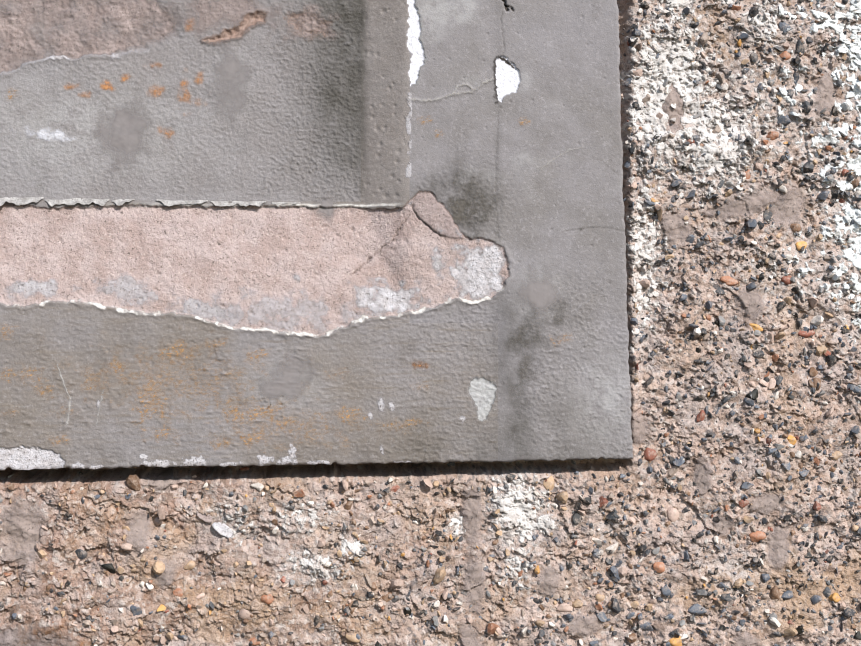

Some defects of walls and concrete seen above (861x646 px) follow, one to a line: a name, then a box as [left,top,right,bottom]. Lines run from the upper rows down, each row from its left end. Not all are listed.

spalling [0,0,174,72]
spalling [194,0,266,42]
peeling [406,0,426,177]
peeling [494,56,520,103]
peeling [0,191,510,337]
peeling [468,377,497,421]
peeling [0,445,104,470]
peeling [140,454,206,467]
peeling [257,444,330,466]